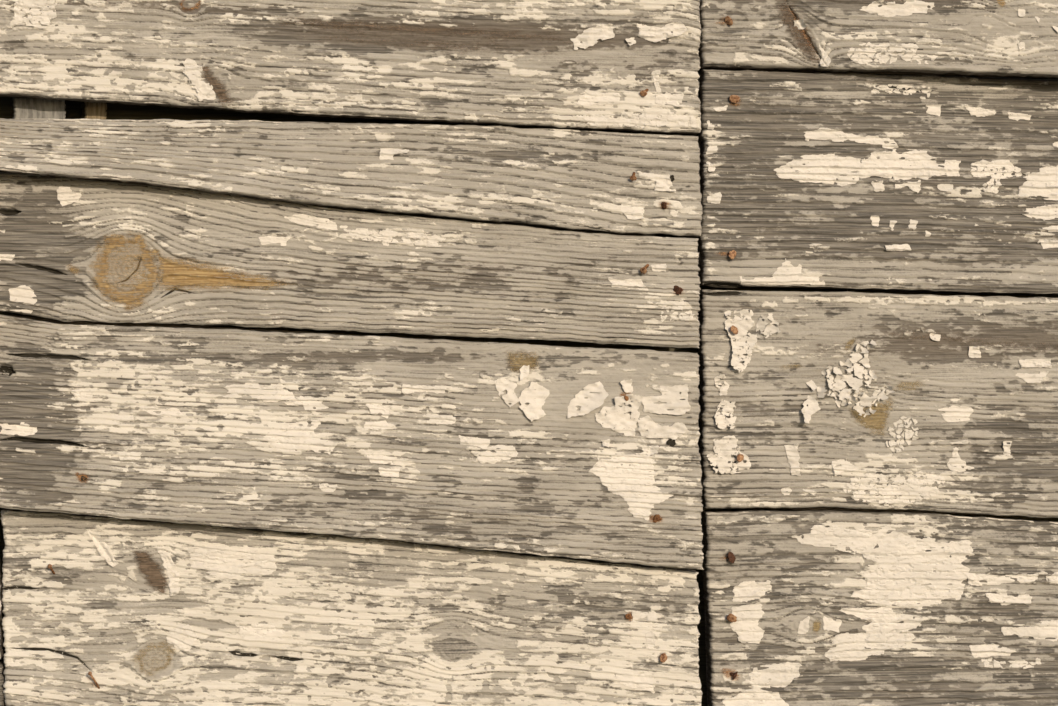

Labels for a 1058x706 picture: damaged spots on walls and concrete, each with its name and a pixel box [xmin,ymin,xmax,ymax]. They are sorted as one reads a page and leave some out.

peeling [570,21,688,50]
peeling [774,128,1058,249]
peeling [495,365,550,422]
peeling [707,309,781,474]
peeling [801,340,895,423]
peeling [885,416,919,453]
peeling [781,443,817,496]